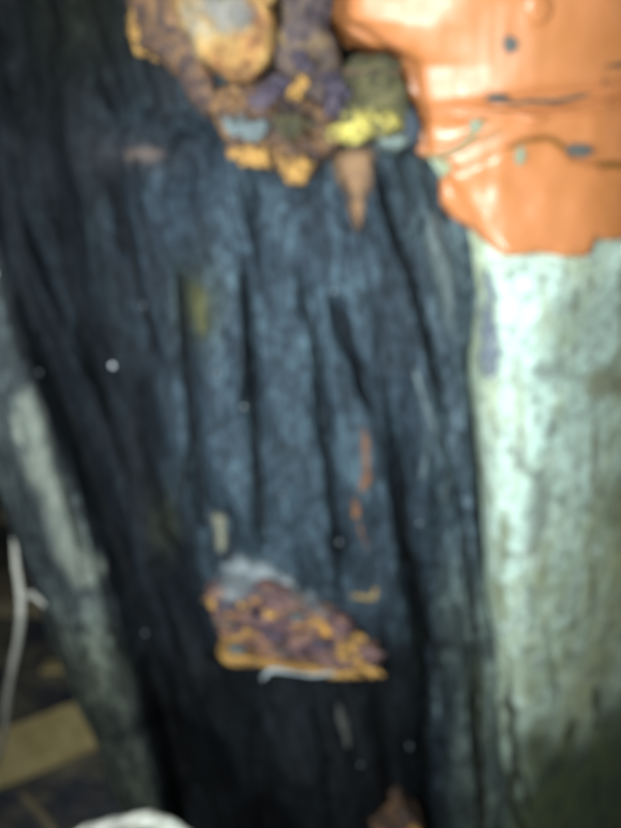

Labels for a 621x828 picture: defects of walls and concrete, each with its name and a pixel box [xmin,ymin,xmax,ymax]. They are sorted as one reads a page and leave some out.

corrosion [325,52,423,227]
peeling [330,0,621,168]